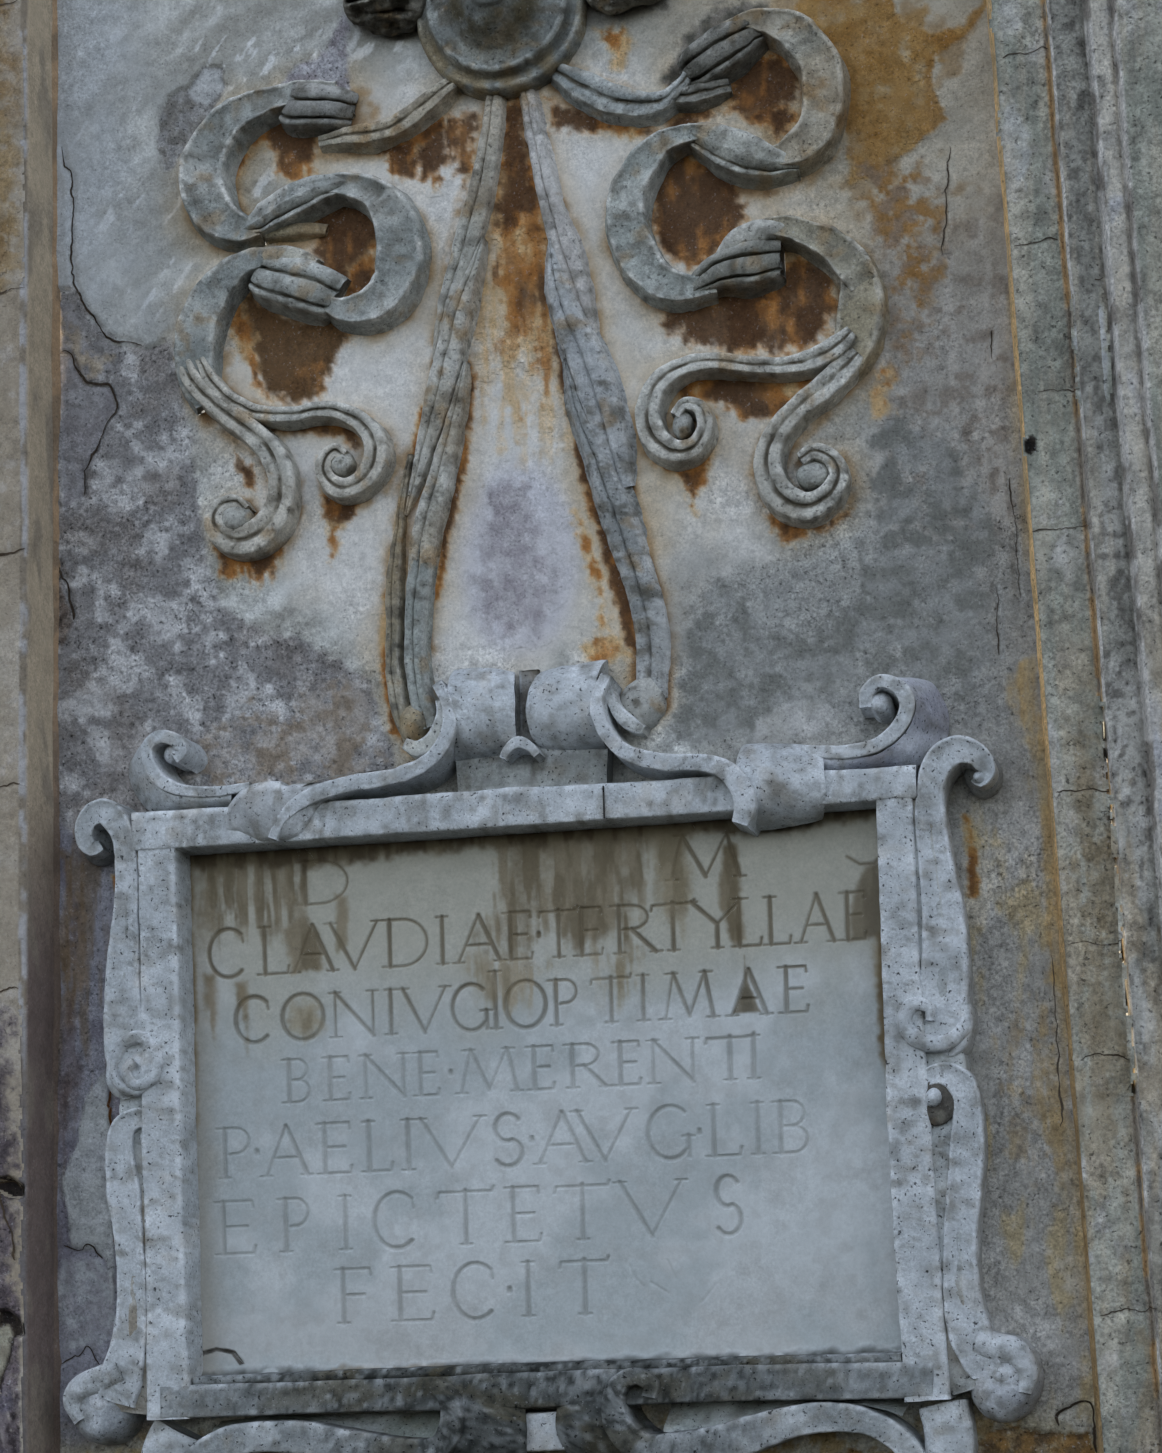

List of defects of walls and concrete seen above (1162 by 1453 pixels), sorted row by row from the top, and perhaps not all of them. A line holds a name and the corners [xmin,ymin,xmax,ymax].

water stain [0,0,25,318]
crack [60,350,118,495]
crack [62,150,142,346]
flaking render [154,61,227,173]
rust [225,292,359,407]
rust [434,97,636,670]
rust [652,155,755,275]
rust [654,251,840,357]
crack [105,1091,113,1126]
water stain [0,988,24,1429]
flaking render [57,1069,117,1356]
flaking render [0,1308,24,1453]